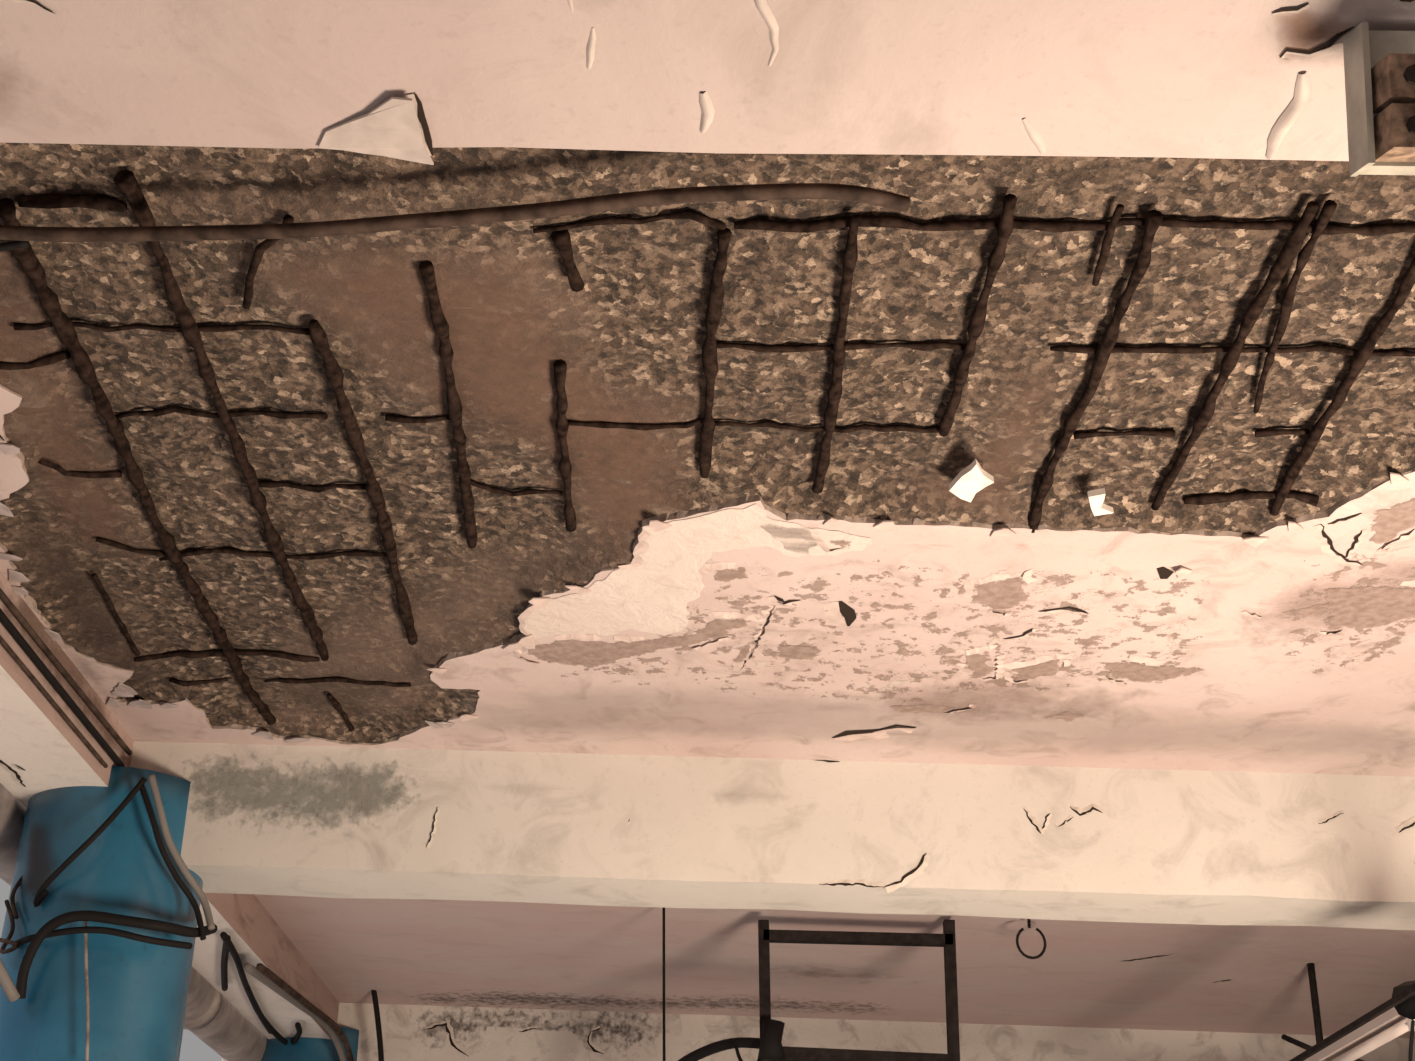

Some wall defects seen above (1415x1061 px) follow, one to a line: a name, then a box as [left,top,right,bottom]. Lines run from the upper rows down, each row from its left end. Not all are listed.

crack [11,0,55,16]
rust [347,273,654,533]
spalling [0,97,1415,743]
rust [8,604,112,742]
water stain [192,760,403,823]